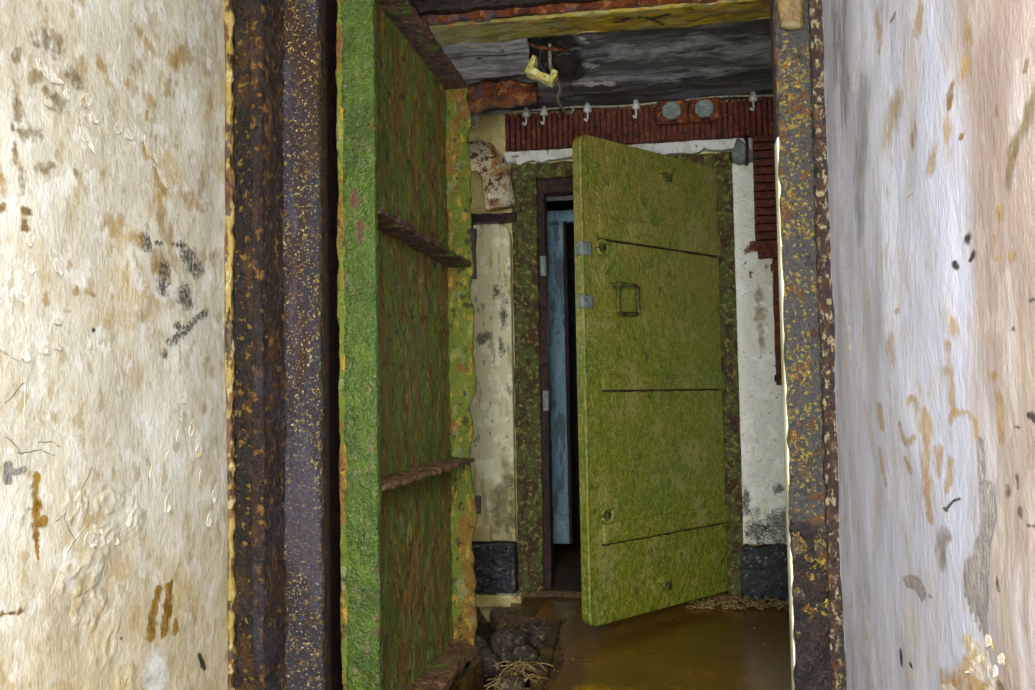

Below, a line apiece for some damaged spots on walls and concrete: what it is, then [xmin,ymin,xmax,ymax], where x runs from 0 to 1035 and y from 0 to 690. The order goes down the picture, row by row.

spalling [528,35,585,83]
mould [139,233,208,359]
rust [31,471,48,559]
mould [740,490,787,546]
rust [147,579,179,641]
rust [789,522,832,690]